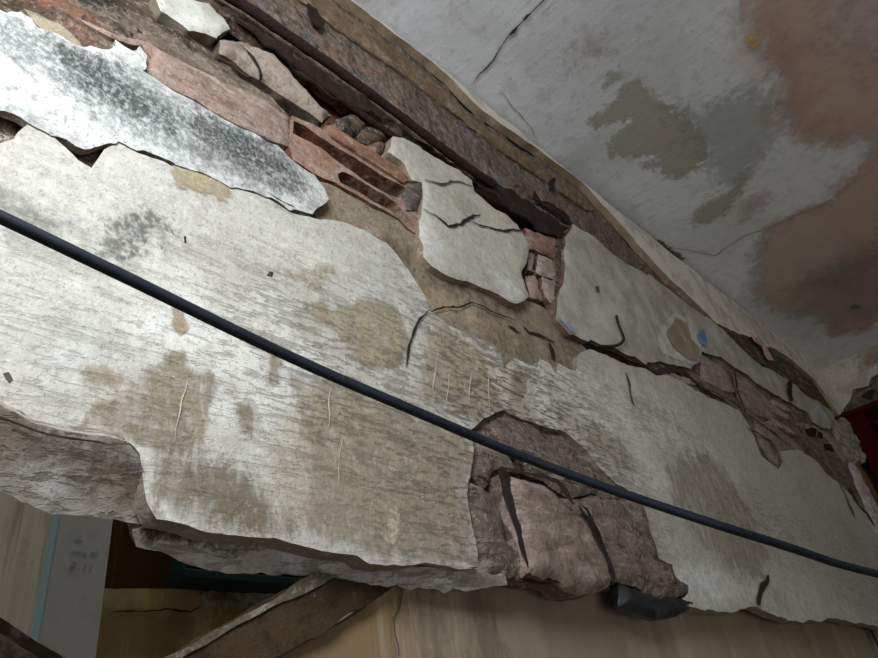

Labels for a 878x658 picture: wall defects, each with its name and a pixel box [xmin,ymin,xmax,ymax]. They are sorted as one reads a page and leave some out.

damp [587,71,712,180]
peeling [0,0,878,511]
crack [424,209,523,232]
damp [690,173,750,227]
crack [0,417,111,445]
flaking render [467,413,688,602]